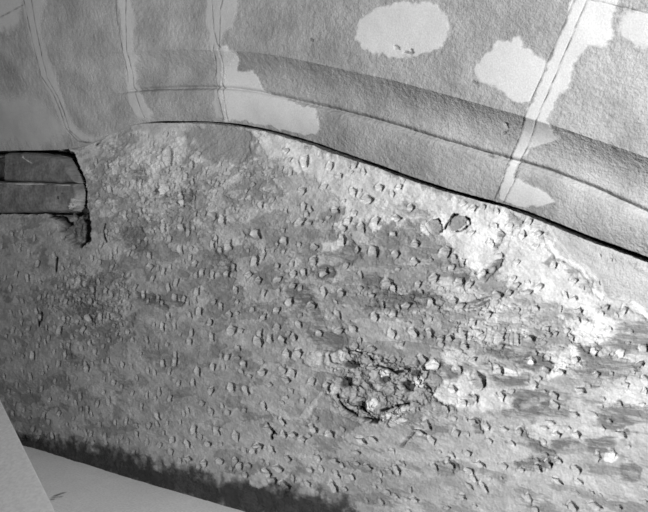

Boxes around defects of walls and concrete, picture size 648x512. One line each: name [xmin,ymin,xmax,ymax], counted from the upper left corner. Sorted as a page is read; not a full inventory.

spalling [0,149,92,247]
flaking render [427,214,471,234]
flaking render [313,265,335,280]
flaking render [362,275,434,316]
flaking render [326,345,440,427]
flaking render [486,337,573,417]
flaking render [573,323,648,388]
flaking render [514,428,573,470]
flaking render [586,400,648,454]